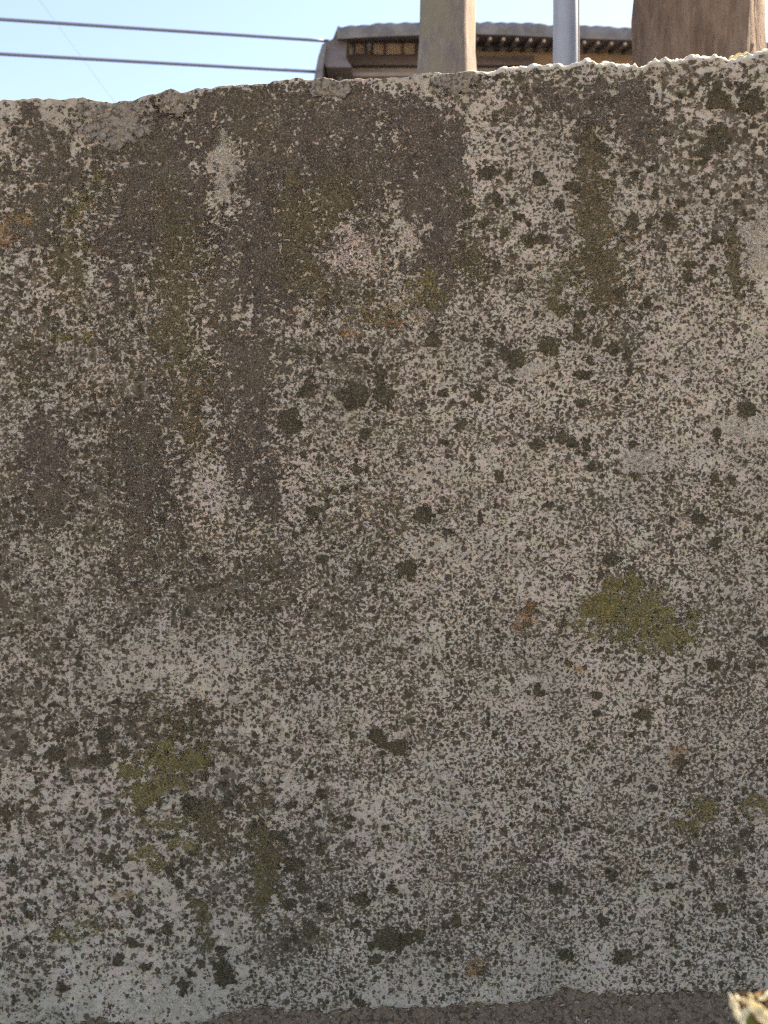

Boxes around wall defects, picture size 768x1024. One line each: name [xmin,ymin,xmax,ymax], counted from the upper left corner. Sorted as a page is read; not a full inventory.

damp [0,80,492,690]